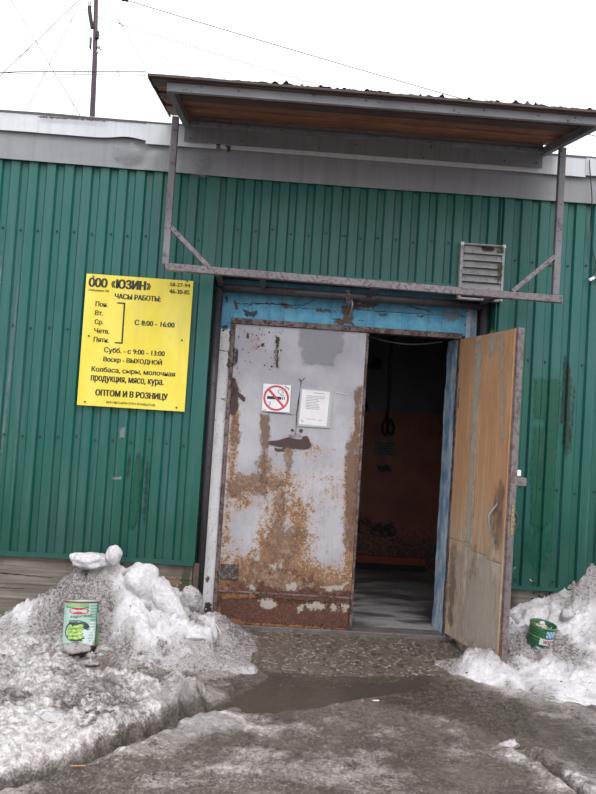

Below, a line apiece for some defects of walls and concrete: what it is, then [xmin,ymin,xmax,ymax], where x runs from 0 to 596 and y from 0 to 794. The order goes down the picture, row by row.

corrosion [334,305,364,326]
corrosion [230,384,245,445]
corrosion [217,455,351,630]
corrosion [341,386,362,548]
damp [525,356,576,570]